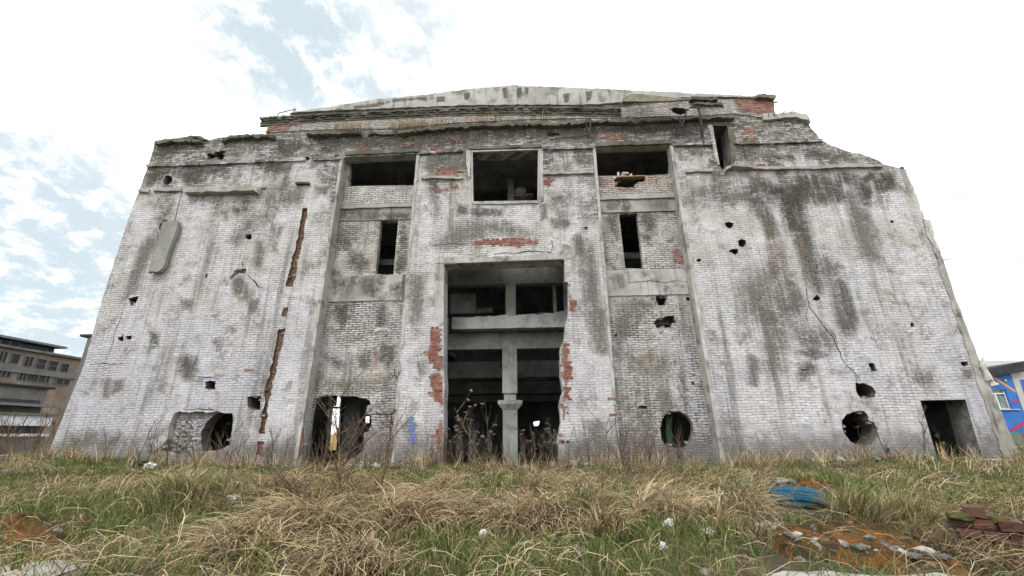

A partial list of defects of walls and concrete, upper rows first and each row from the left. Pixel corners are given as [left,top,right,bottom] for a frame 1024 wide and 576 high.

flaking render [728,98,778,164]
leakage [266,189,304,217]
flaking render [433,166,463,192]
leakage [124,237,157,299]
leakage [234,275,258,312]
flaking render [472,237,539,248]
leakage [691,170,895,387]
crack [785,257,860,380]
flaking render [423,327,443,455]
flaking render [559,344,573,419]
spalling [160,408,235,455]
hole [842,411,878,446]